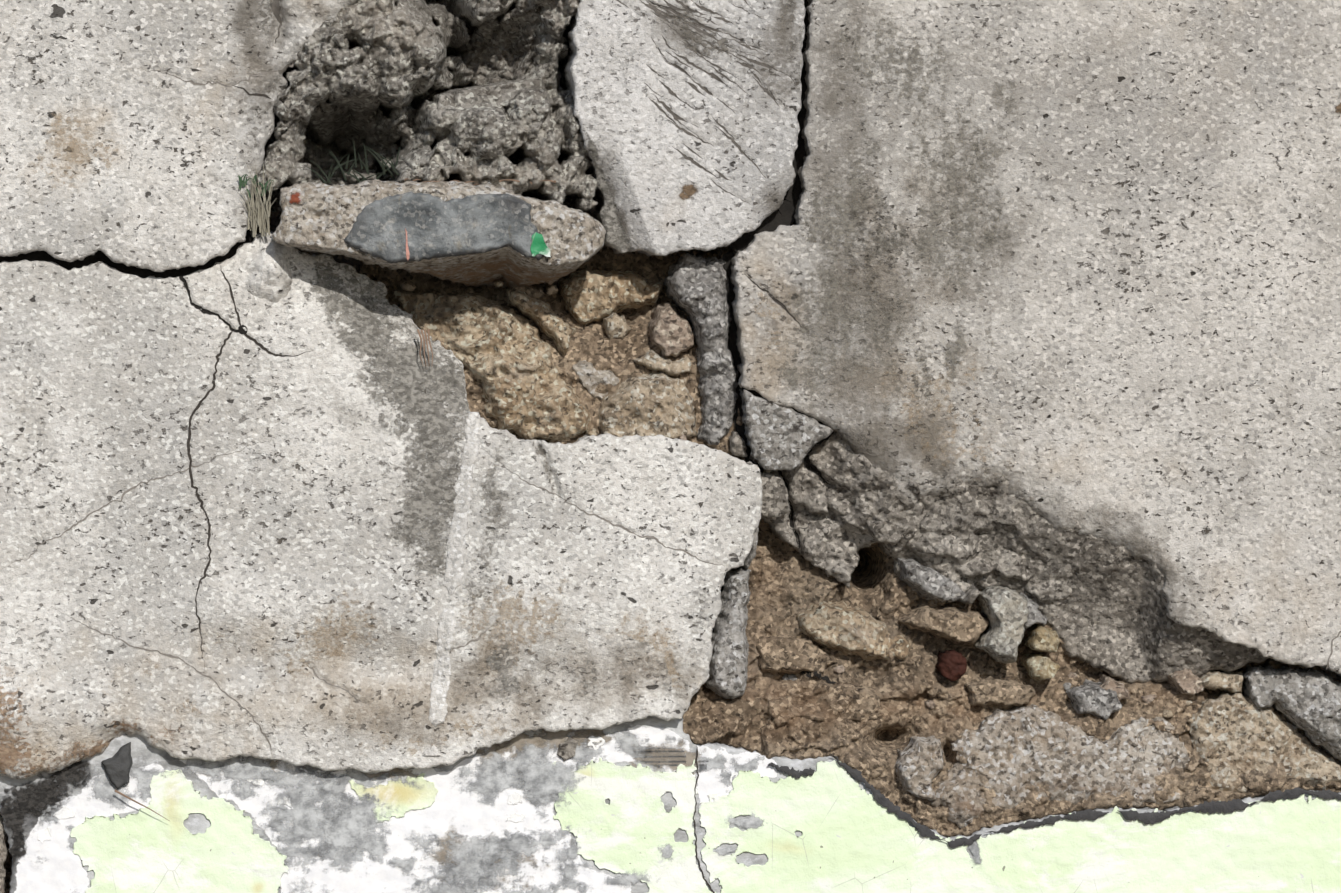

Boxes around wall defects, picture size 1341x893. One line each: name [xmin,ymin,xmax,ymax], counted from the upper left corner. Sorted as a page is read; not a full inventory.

spalling [251,0,599,212]
crack [722,0,833,549]
water stain [781,0,801,82]
water stain [780,13,1009,406]
water stain [993,81,1016,130]
crack [0,228,310,755]
spalling [14,244,1341,893]